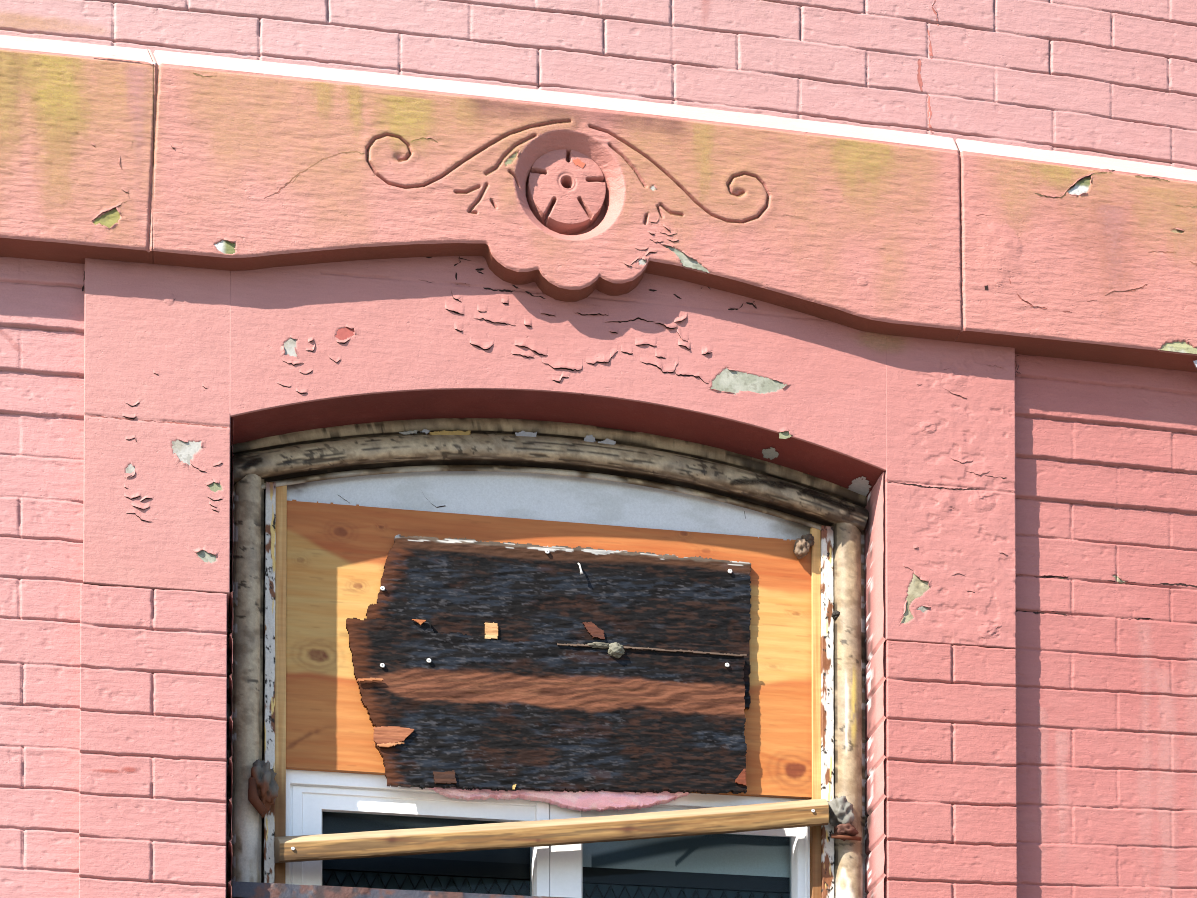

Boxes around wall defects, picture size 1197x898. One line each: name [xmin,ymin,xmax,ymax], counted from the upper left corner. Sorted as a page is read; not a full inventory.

water stain [0,53,145,140]
crack [917,0,939,133]
spalling [92,185,129,232]
crack [265,151,365,198]
crack [1035,169,1197,208]
peeling [277,323,359,394]
peeling [445,283,793,395]
spalling [1158,341,1197,368]
peeling [171,435,224,512]
peeling [899,561,932,625]
crack [1016,571,1068,579]
crack [1108,579,1197,587]